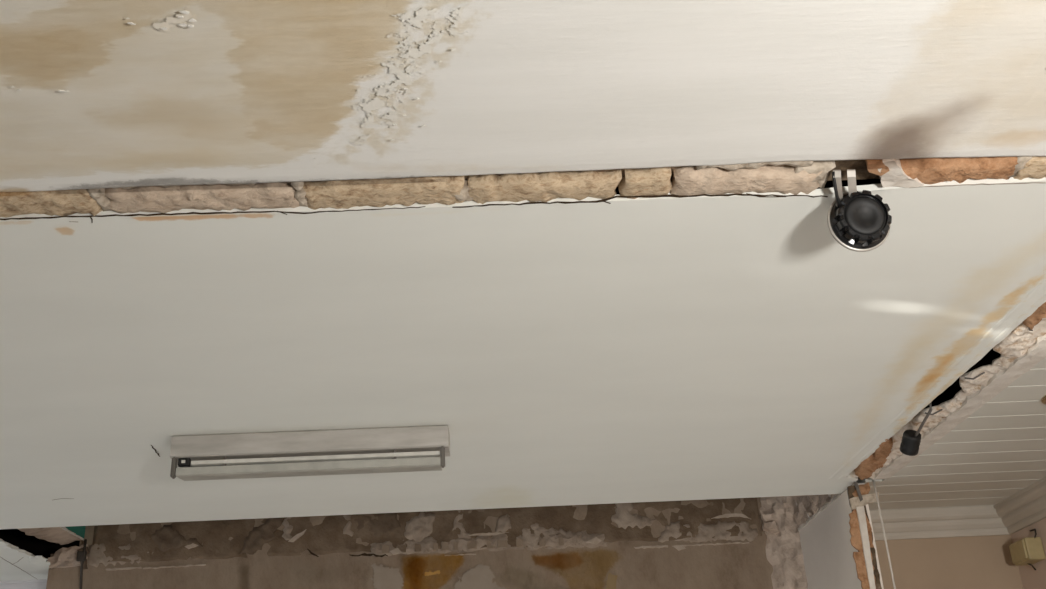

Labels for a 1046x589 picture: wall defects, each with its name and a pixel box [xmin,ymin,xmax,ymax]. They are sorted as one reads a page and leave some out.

flaking render [0,156,1046,218]
flaking render [28,302,1046,589]